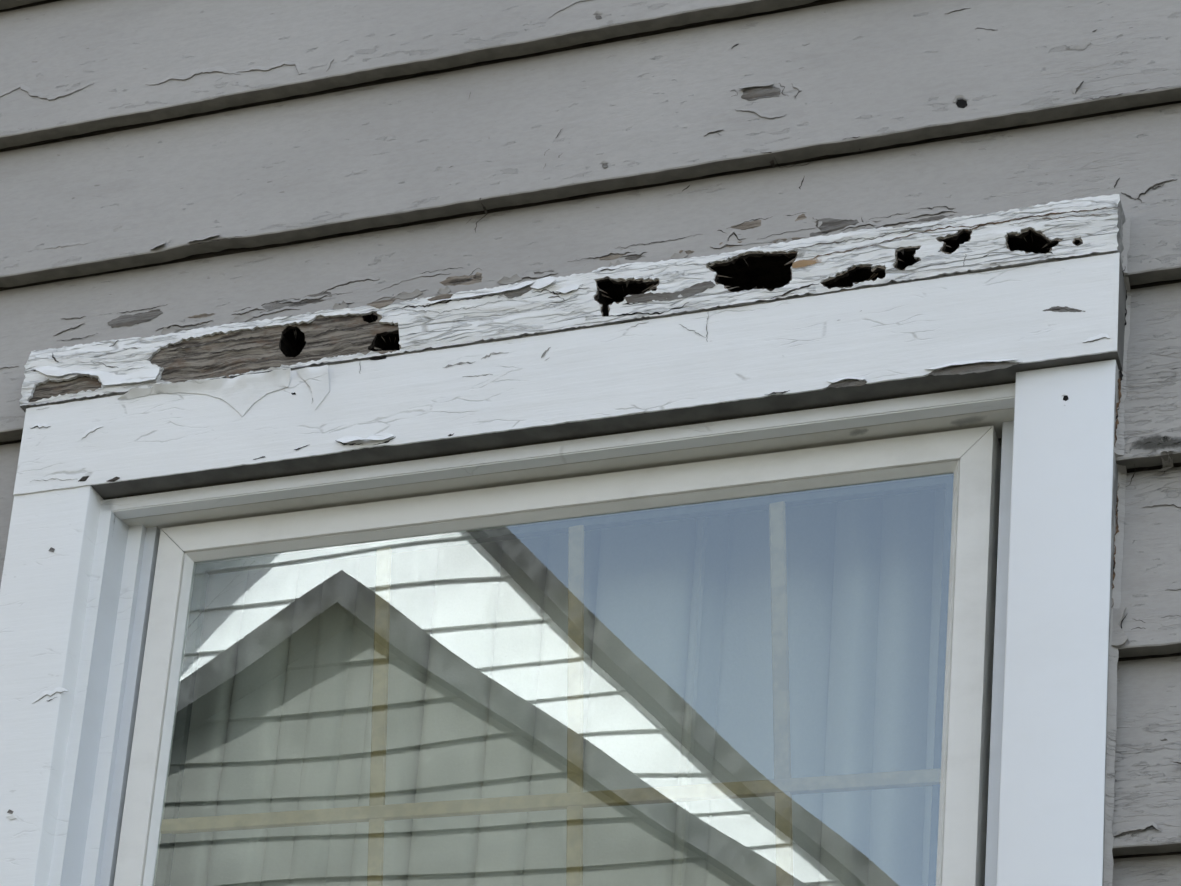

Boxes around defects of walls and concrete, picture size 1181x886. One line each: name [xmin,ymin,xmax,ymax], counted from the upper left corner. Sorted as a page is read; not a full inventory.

peeling [731,82,802,119]
peeling [711,206,955,249]
peeling [584,248,646,272]
peeling [671,250,694,259]
peeling [31,353,160,386]